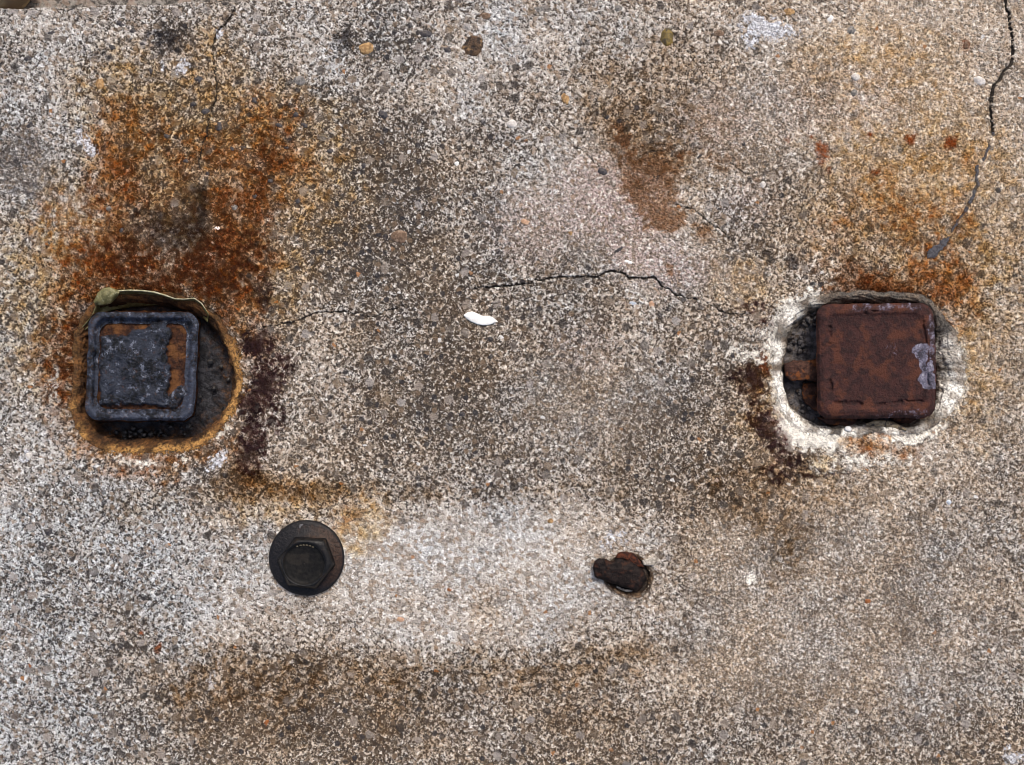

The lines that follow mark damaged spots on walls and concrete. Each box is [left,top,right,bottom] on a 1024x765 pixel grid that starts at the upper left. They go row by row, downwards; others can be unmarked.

crack [927,0,1015,259]
corrosion [236,332,294,478]
crack [246,308,397,331]
crack [474,270,745,315]
spalling [769,290,972,441]